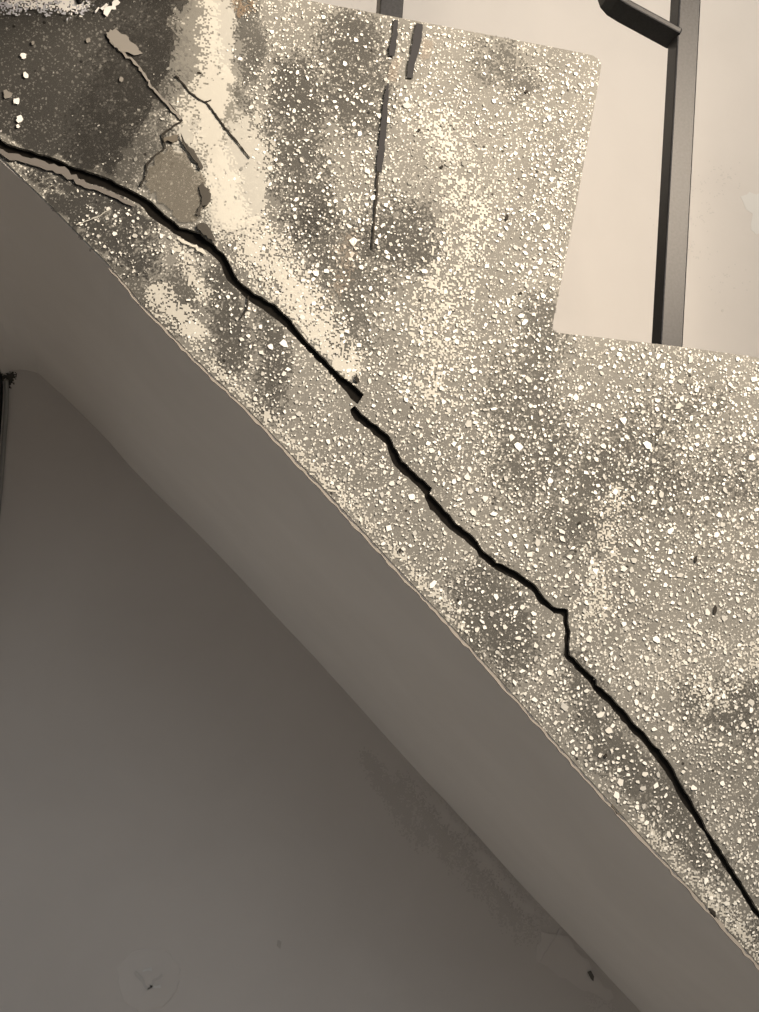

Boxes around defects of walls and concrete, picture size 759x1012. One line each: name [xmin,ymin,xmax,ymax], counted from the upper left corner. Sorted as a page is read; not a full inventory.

peeling [106,29,150,59]
crack [140,103,183,187]
spalling [156,133,206,169]
crack [175,75,250,158]
crack [0,140,759,918]
spalling [0,149,759,952]
crack [134,971,163,990]